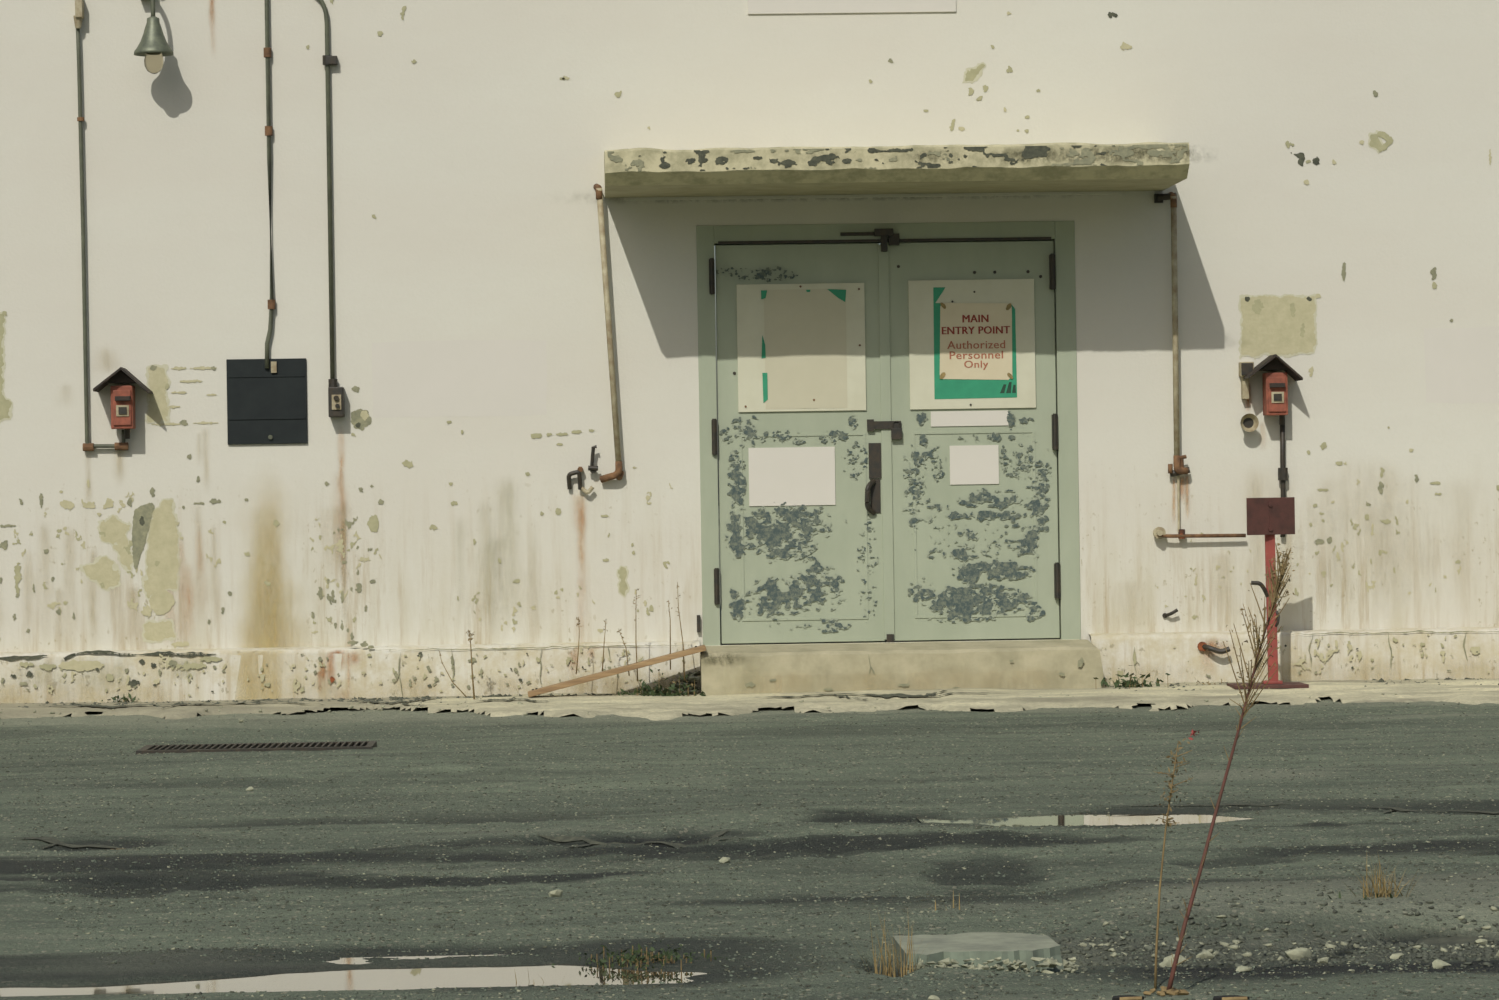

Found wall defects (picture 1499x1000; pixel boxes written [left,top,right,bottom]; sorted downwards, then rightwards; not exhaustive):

spalling [962,45,995,101]
spalling [607,115,1188,172]
spalling [1285,141,1337,185]
spalling [1359,130,1393,154]
peeling [0,311,13,423]
peeling [145,364,218,426]
peeling [1238,293,1321,377]
peeling [720,415,878,633]
peeling [903,411,1052,623]
peeling [0,479,226,696]
spalling [310,485,643,692]
peeling [1241,626,1480,674]